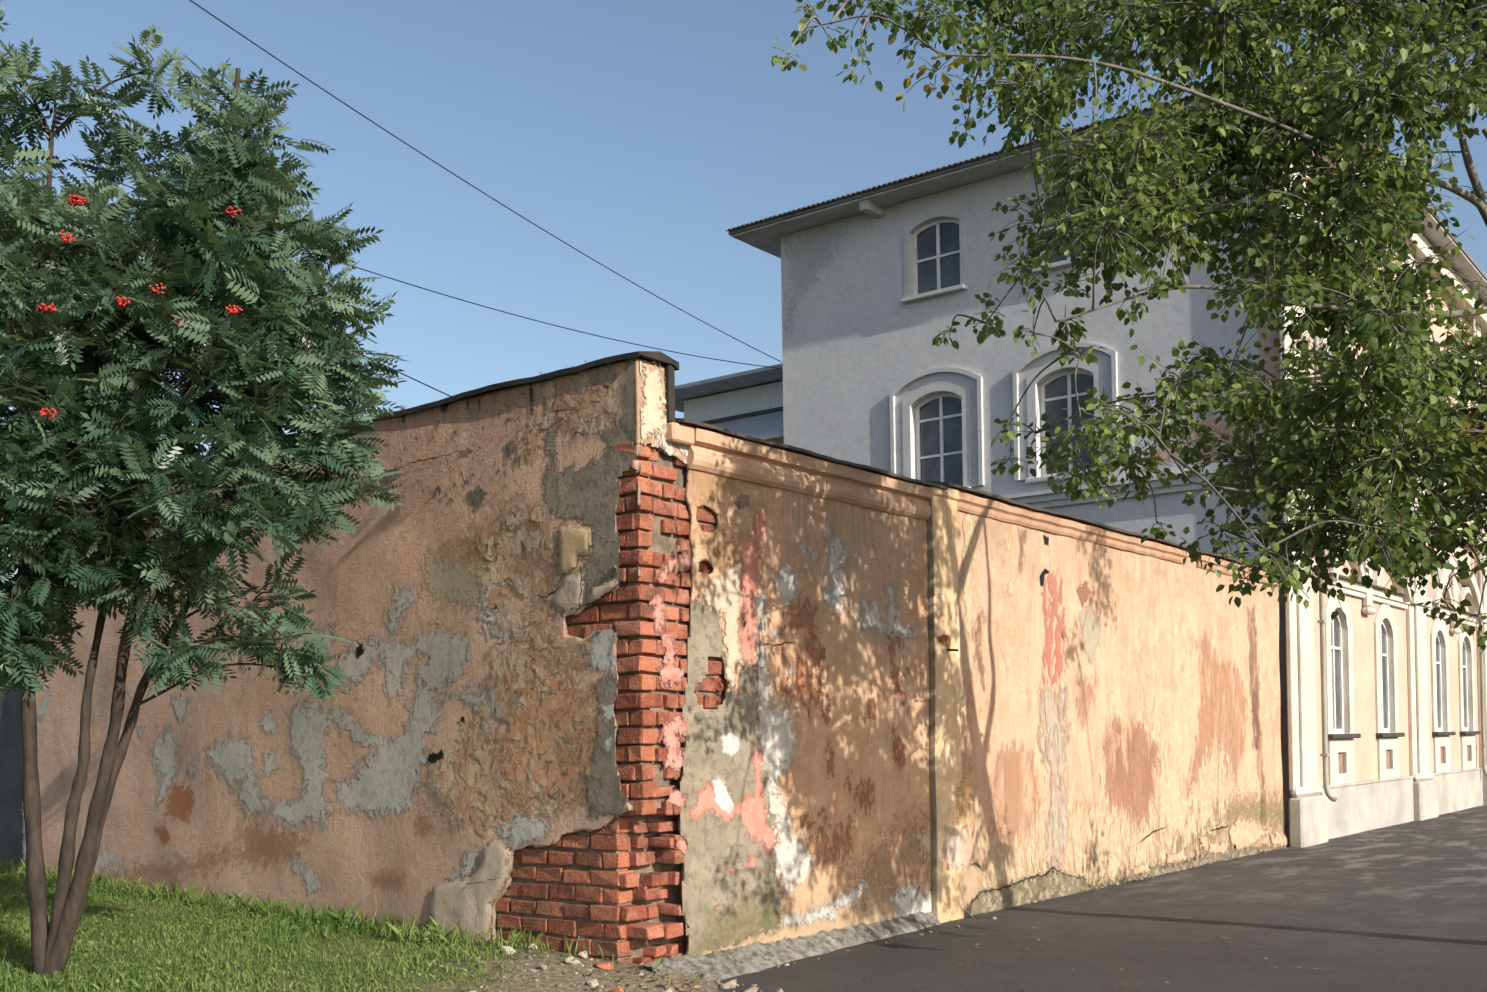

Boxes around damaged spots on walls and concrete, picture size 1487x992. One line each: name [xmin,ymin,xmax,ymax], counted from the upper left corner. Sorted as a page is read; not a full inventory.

spalling [138,357,921,966]
leakage [989,737,1041,847]
leakage [1075,581,1101,728]
peeling [915,571,1288,917]
leakage [1100,608,1288,852]